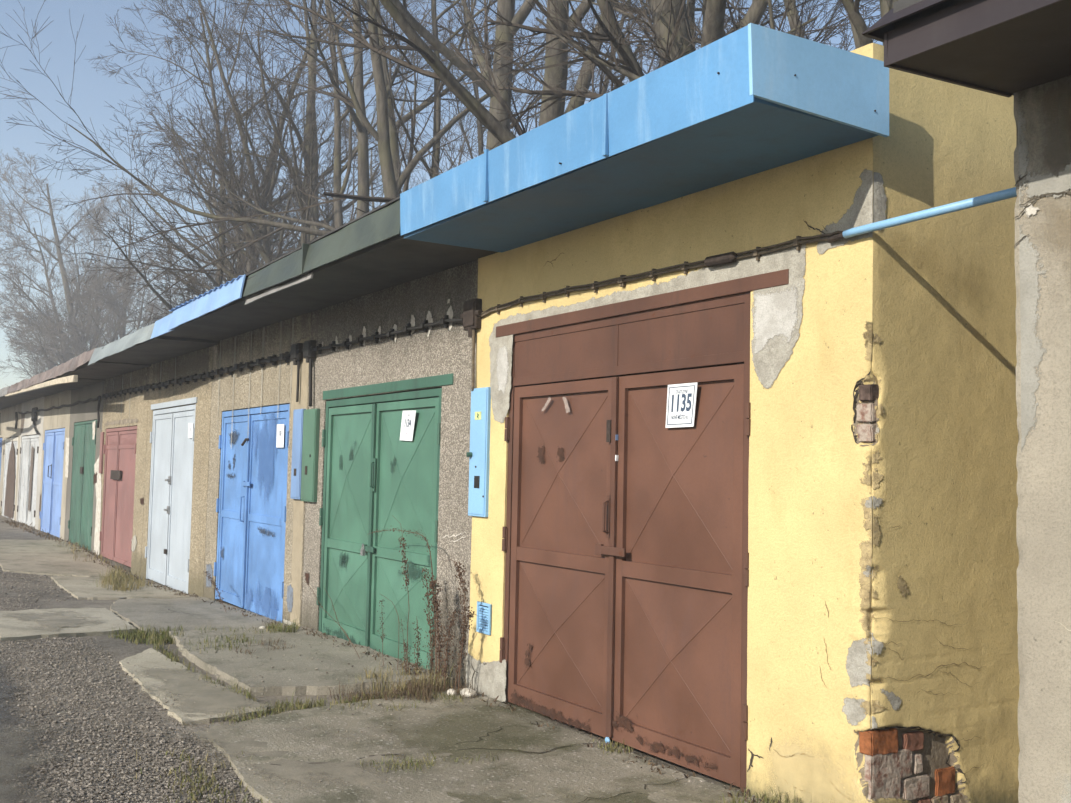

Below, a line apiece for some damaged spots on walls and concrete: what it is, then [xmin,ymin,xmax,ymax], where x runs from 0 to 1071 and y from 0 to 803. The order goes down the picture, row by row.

spalling [816,169,887,254]
spalling [842,323,970,803]
crack [872,575,980,695]